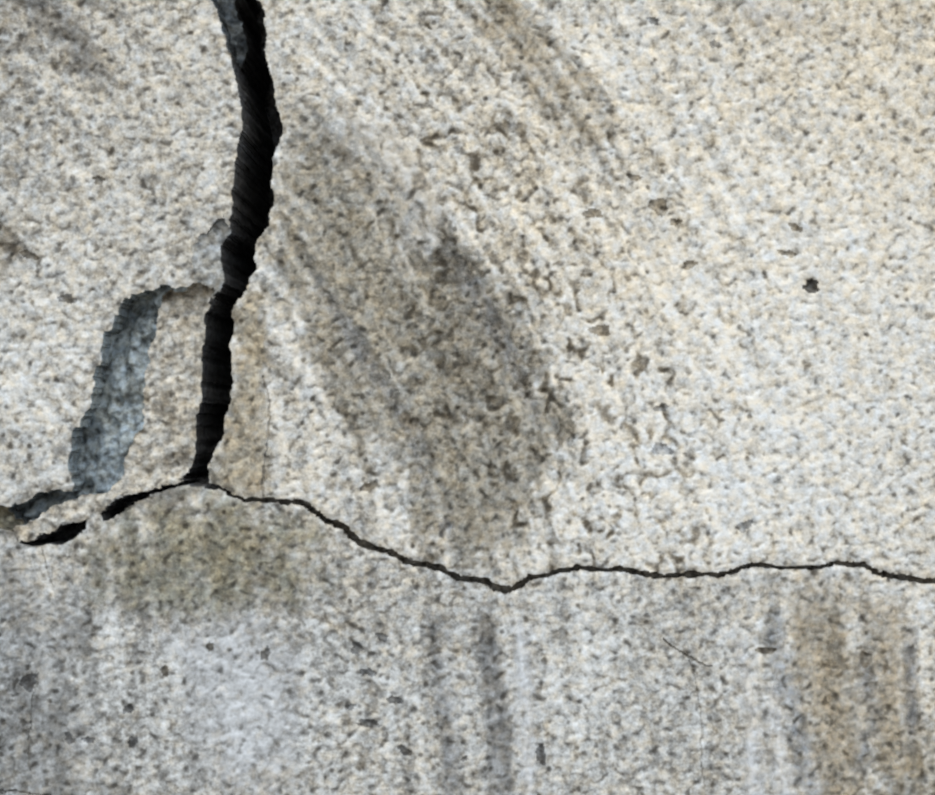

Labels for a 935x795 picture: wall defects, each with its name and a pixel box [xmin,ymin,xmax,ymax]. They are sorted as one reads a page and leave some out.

spalling [8,281,215,542]
crack [0,0,935,594]